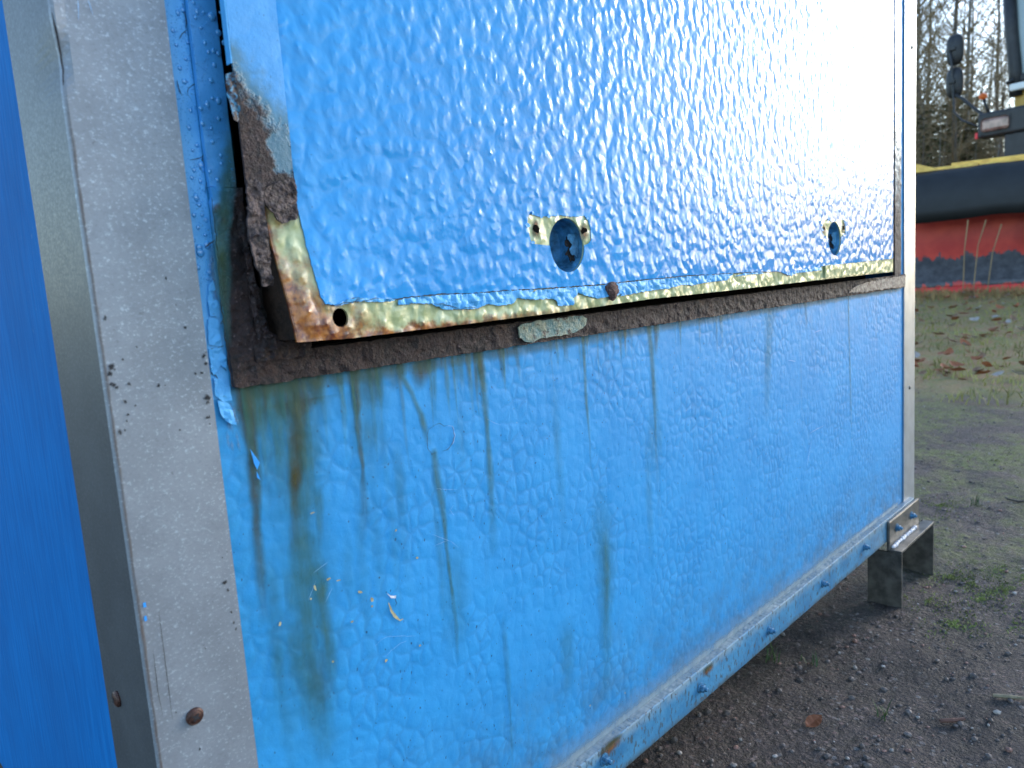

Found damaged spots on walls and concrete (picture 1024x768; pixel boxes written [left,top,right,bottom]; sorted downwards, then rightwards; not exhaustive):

peeling [225,72,249,122]
peeling [266,207,885,340]
peeling [207,280,237,425]
corrosion [236,384,268,539]
corrosion [280,375,321,497]
corrosion [350,370,359,421]